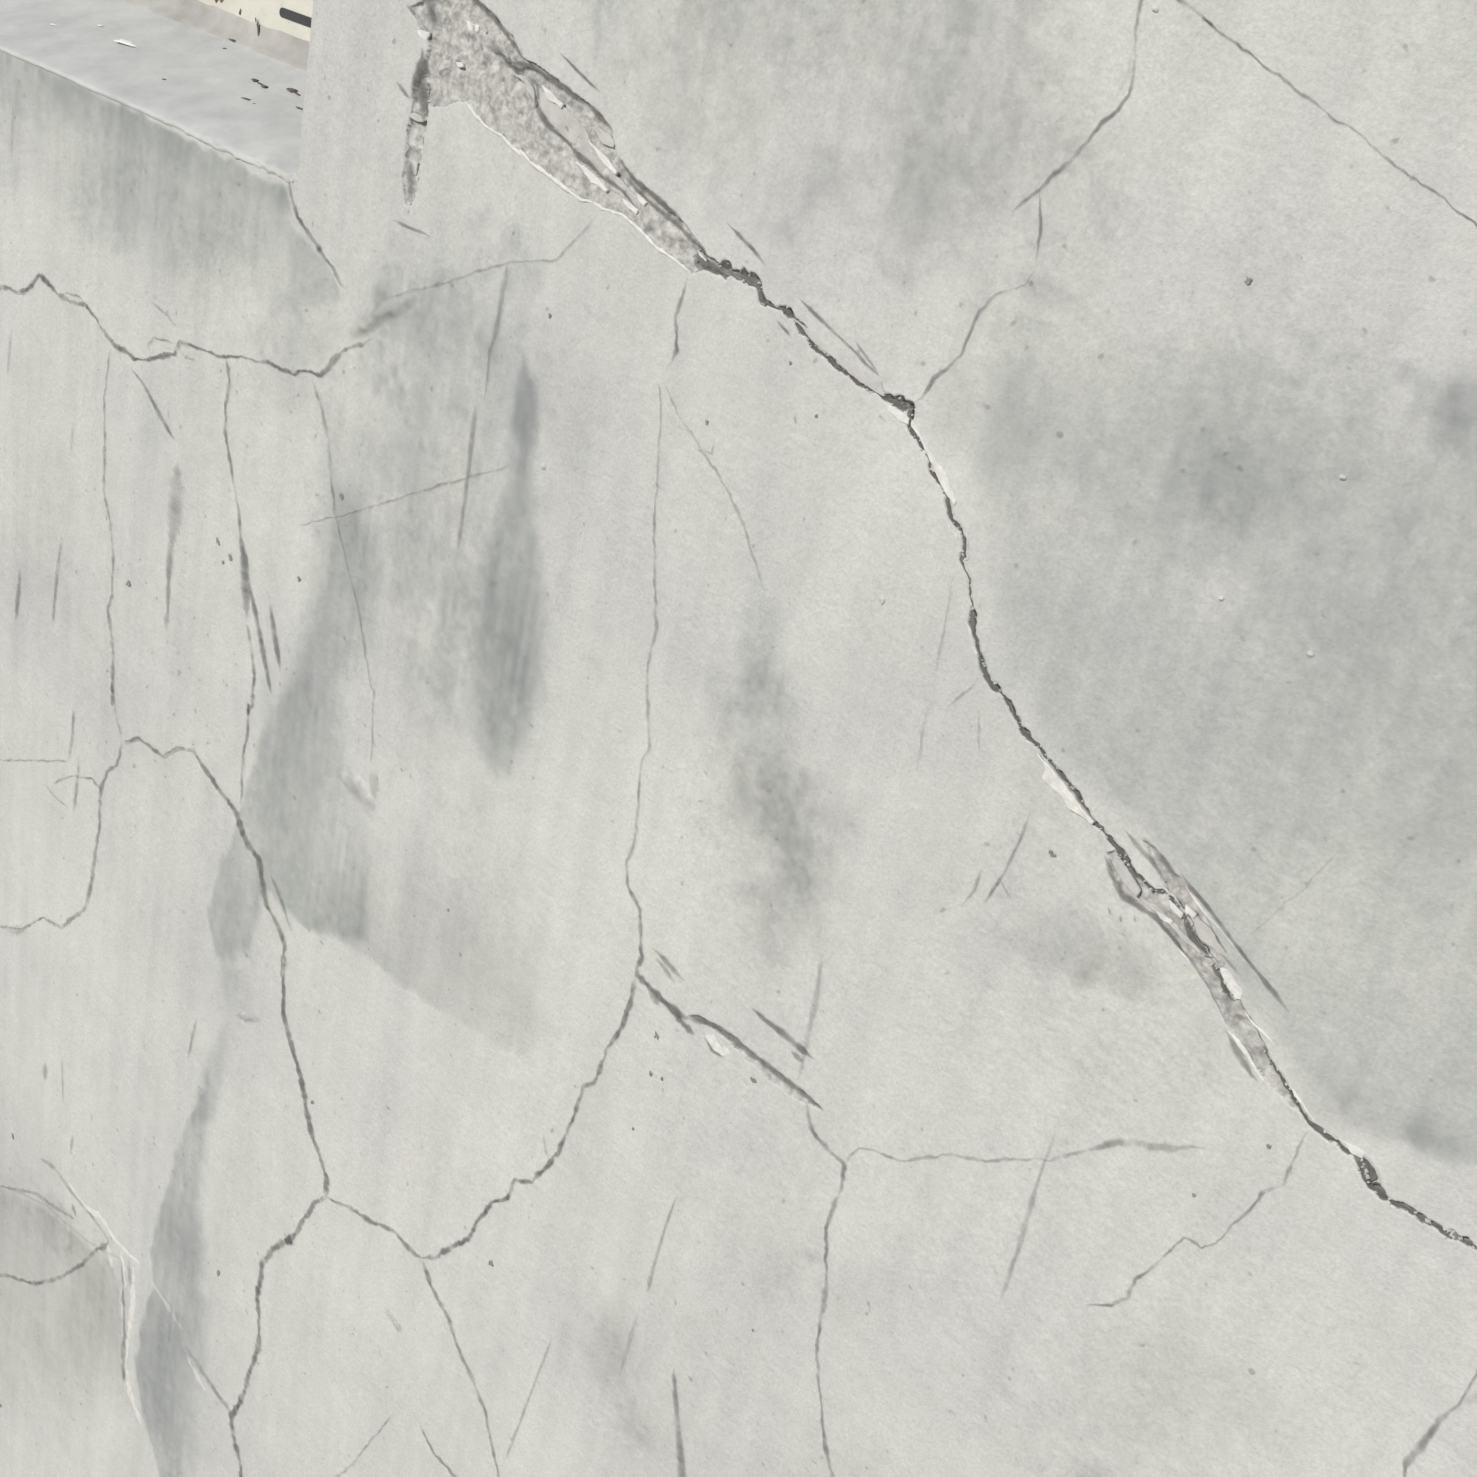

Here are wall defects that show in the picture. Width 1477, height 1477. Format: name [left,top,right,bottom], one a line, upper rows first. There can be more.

spalling [402,0,709,273]
crack [1090,90,1130,137]
crack [1025,169,1060,240]
crack [1418,181,1477,226]
crack [4,274,346,377]
crack [693,244,1237,1002]
flaking render [1037,753,1096,825]
spalling [1107,841,1314,1120]
crack [116,737,636,1477]
crack [1263,1046,1477,1250]
crack [823,1211,831,1260]
crack [818,1385,827,1456]